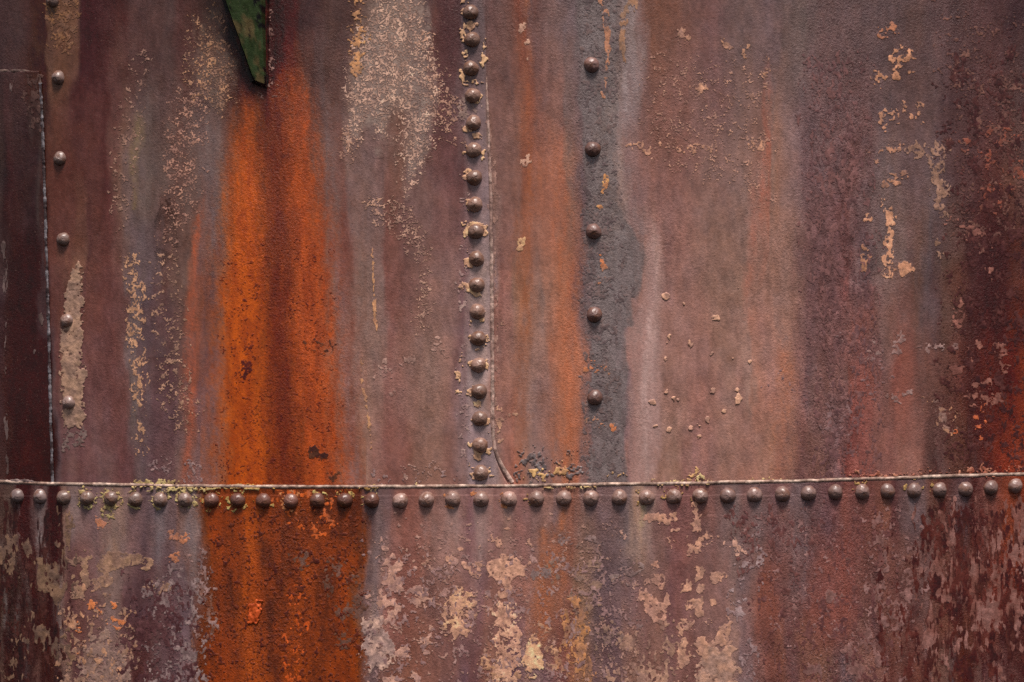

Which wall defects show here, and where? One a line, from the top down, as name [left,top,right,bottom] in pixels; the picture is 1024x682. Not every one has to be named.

peeling [58,260,88,452]
peeling [120,0,344,485]
rust [177,0,372,682]
peeling [337,0,518,485]
rust [498,0,595,658]
rust [763,318,807,470]
peeling [860,170,915,279]
rust [841,243,1024,482]
peeling [866,0,1024,259]
peeling [0,490,1024,682]